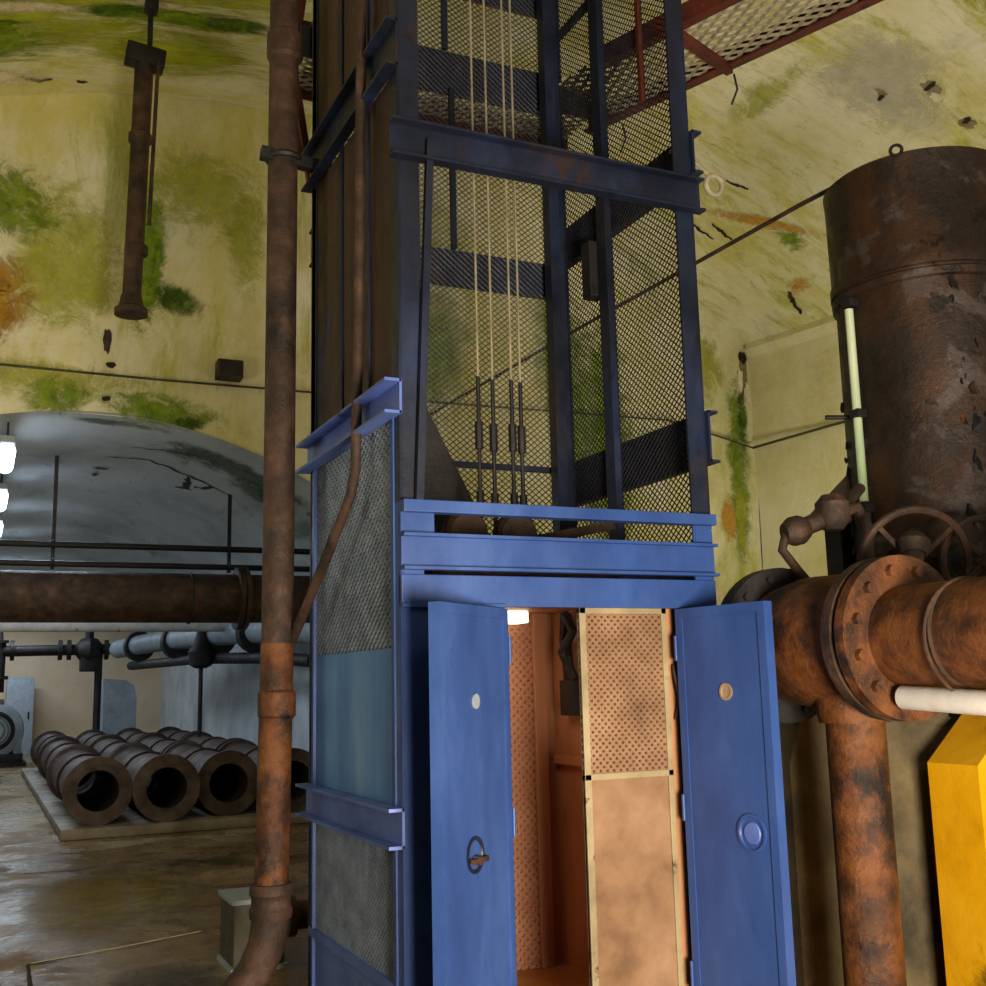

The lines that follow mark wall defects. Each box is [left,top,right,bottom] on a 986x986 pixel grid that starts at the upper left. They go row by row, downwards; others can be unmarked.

damp [86,4,142,17]
damp [206,18,268,35]
rust [0,259,32,329]
damp [738,393,747,441]
damp [735,488,746,547]